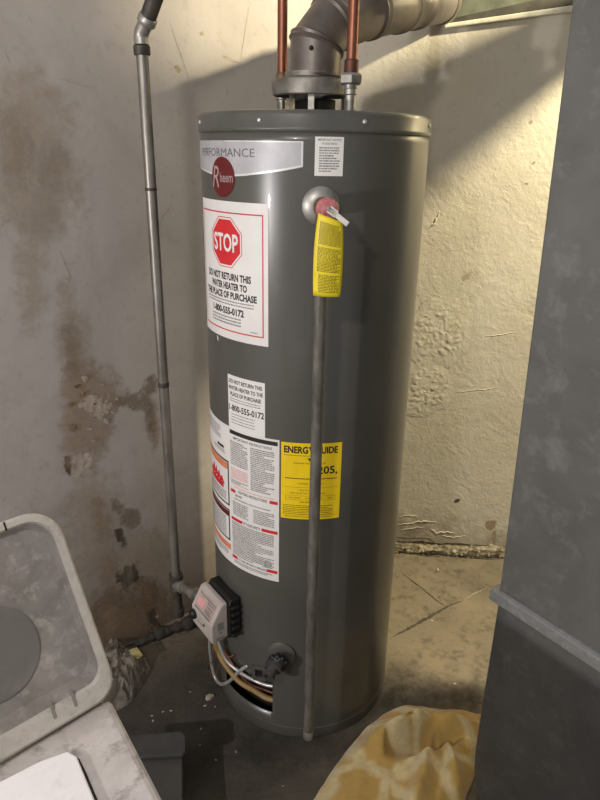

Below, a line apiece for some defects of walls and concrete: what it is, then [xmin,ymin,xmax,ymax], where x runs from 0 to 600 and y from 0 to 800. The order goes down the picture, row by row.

water stain [115,375,158,438]
spalling [395,515,505,558]
crack [394,574,486,636]